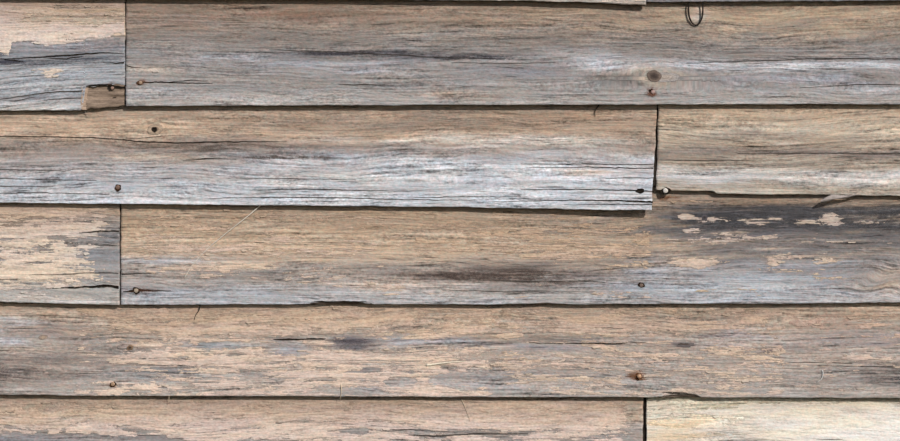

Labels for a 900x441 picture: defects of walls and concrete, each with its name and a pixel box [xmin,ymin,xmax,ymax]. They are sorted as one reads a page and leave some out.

peeling [31,68,64,78]
spalling [81,84,125,110]
peeling [0,205,900,441]